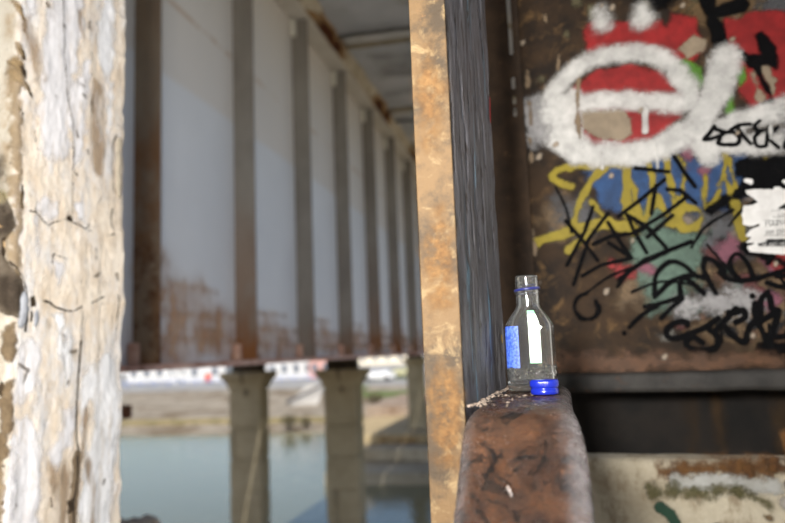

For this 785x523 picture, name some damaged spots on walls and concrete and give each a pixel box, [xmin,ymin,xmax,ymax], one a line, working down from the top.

spalling [11,0,34,32]
peeling [35,0,115,175]
rust [306,9,345,60]
rust [371,94,391,127]
peeling [0,41,123,523]
crack [8,261,120,523]